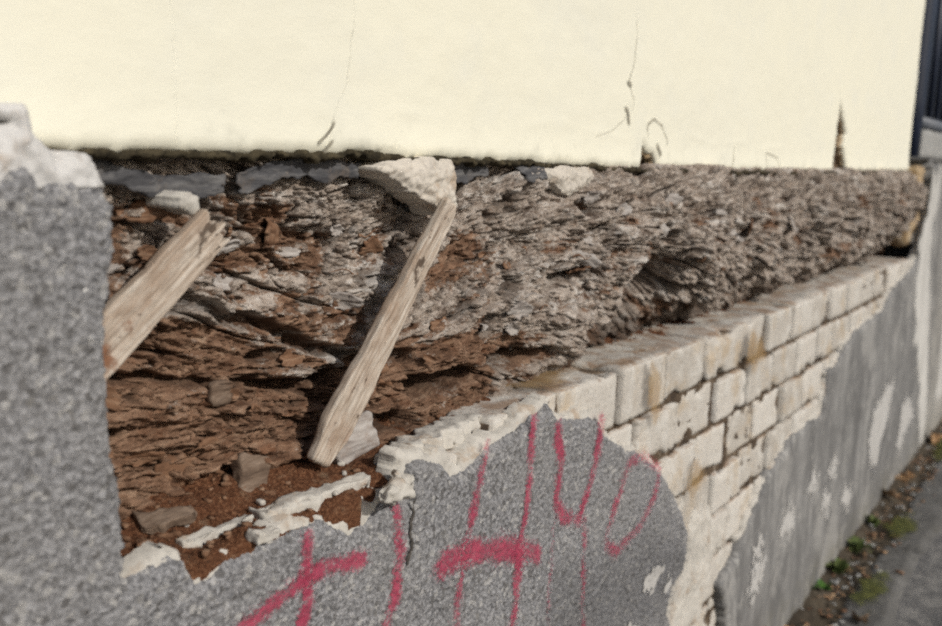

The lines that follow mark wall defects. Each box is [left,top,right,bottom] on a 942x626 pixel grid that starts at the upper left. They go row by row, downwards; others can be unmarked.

crack [626,81,668,156]
peeling [112,199,173,224]
peeling [264,217,301,257]
peeling [566,231,603,274]
peeling [198,273,234,291]
peeling [505,301,534,336]
spalling [729,165,930,543]
spalling [376,393,667,482]
spalling [253,491,381,544]
spalling [120,541,180,578]
peeling [643,565,679,596]
peeling [746,533,767,606]